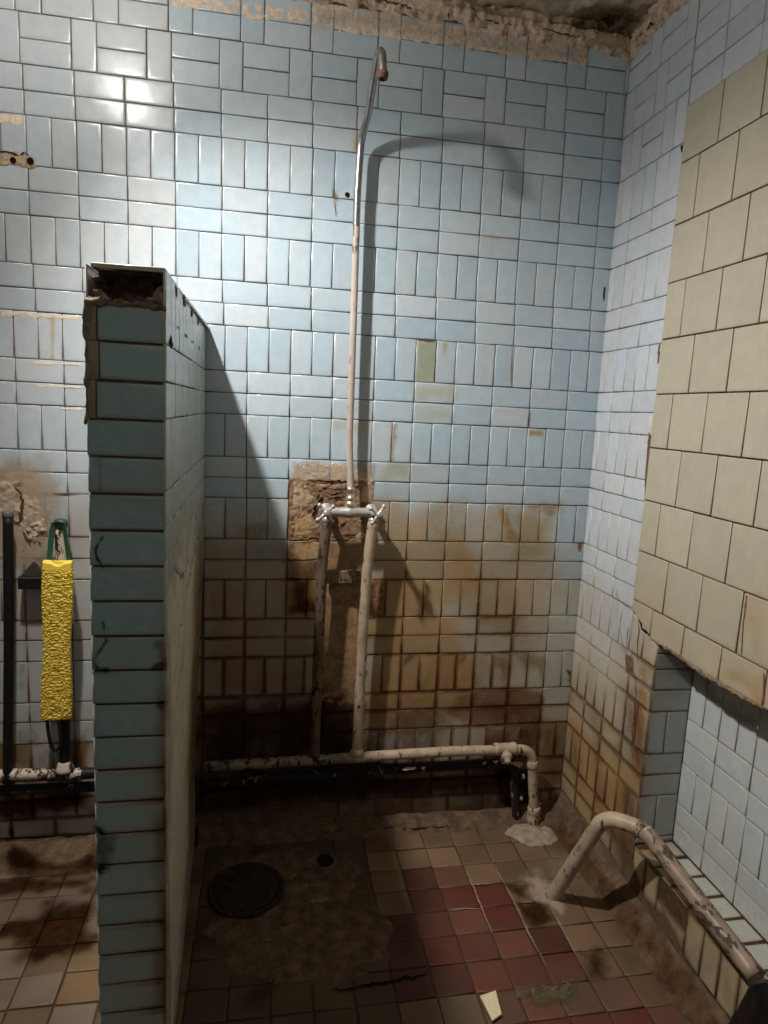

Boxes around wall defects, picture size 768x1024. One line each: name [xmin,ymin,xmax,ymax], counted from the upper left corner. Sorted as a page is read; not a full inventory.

flaking render [169,0,689,66]
spalling [0,151,37,170]
flaking render [2,270,166,425]
flaking render [288,462,375,541]